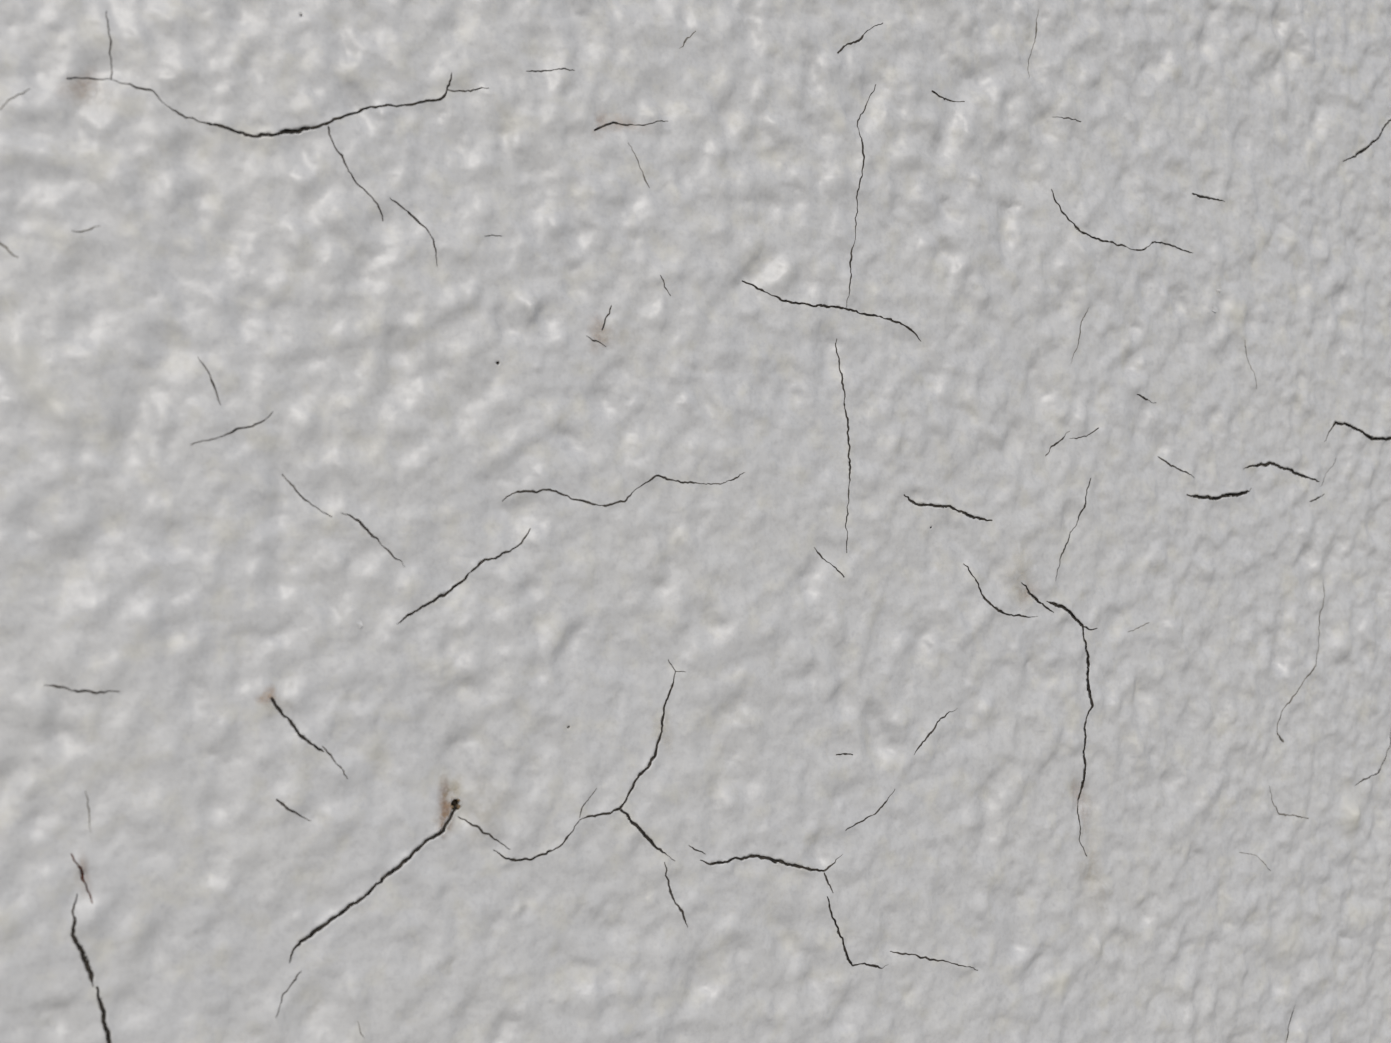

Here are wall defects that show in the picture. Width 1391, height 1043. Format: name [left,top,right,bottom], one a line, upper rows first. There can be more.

crack [66,11,487,264]
crack [1343,119,1391,162]
crack [1051,189,1192,253]
crack [742,84,921,577]
crack [502,472,745,507]
crack [904,494,992,521]
crack [1158,421,1391,502]
crack [397,528,531,624]
crack [963,478,1148,856]
crack [270,659,978,1017]
crack [71,791,111,1043]